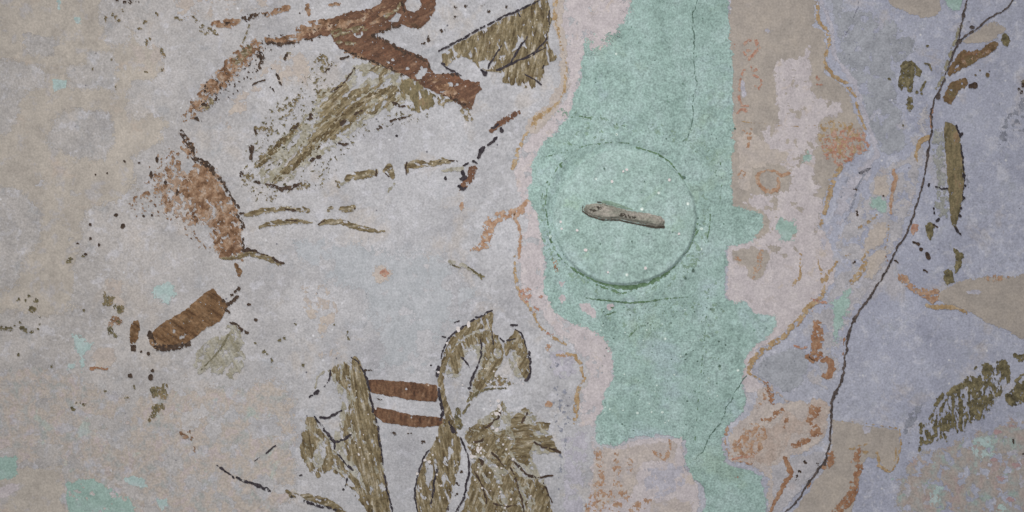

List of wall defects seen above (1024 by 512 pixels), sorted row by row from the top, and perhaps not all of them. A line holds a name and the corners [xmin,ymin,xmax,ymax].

flaking render [720,0,941,259]
crack [785,0,1013,512]